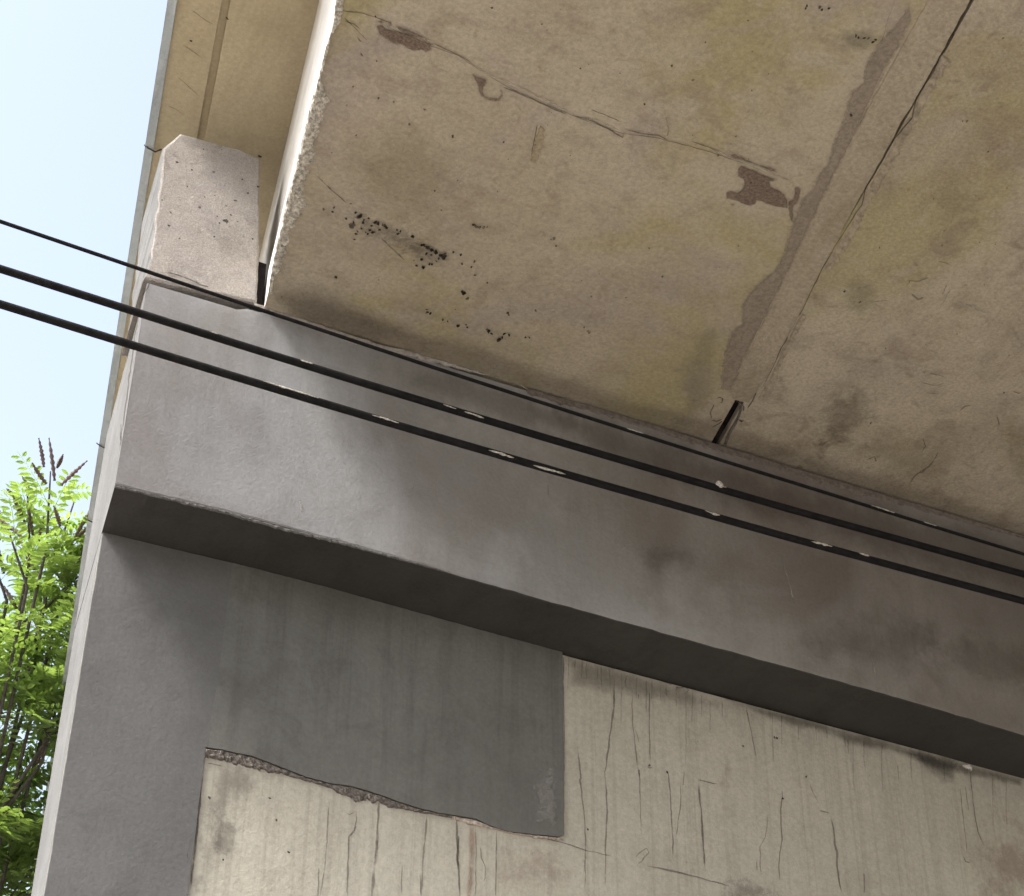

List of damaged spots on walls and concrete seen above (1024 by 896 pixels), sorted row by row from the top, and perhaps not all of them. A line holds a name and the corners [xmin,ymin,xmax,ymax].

spalling [268,0,344,294]
crack [432,45,775,172]
leakage [722,10,910,390]
crack [710,29,956,427]
crack [244,755,513,889]
spalling [205,749,564,841]
crack [668,775,715,863]
crack [776,793,784,874]